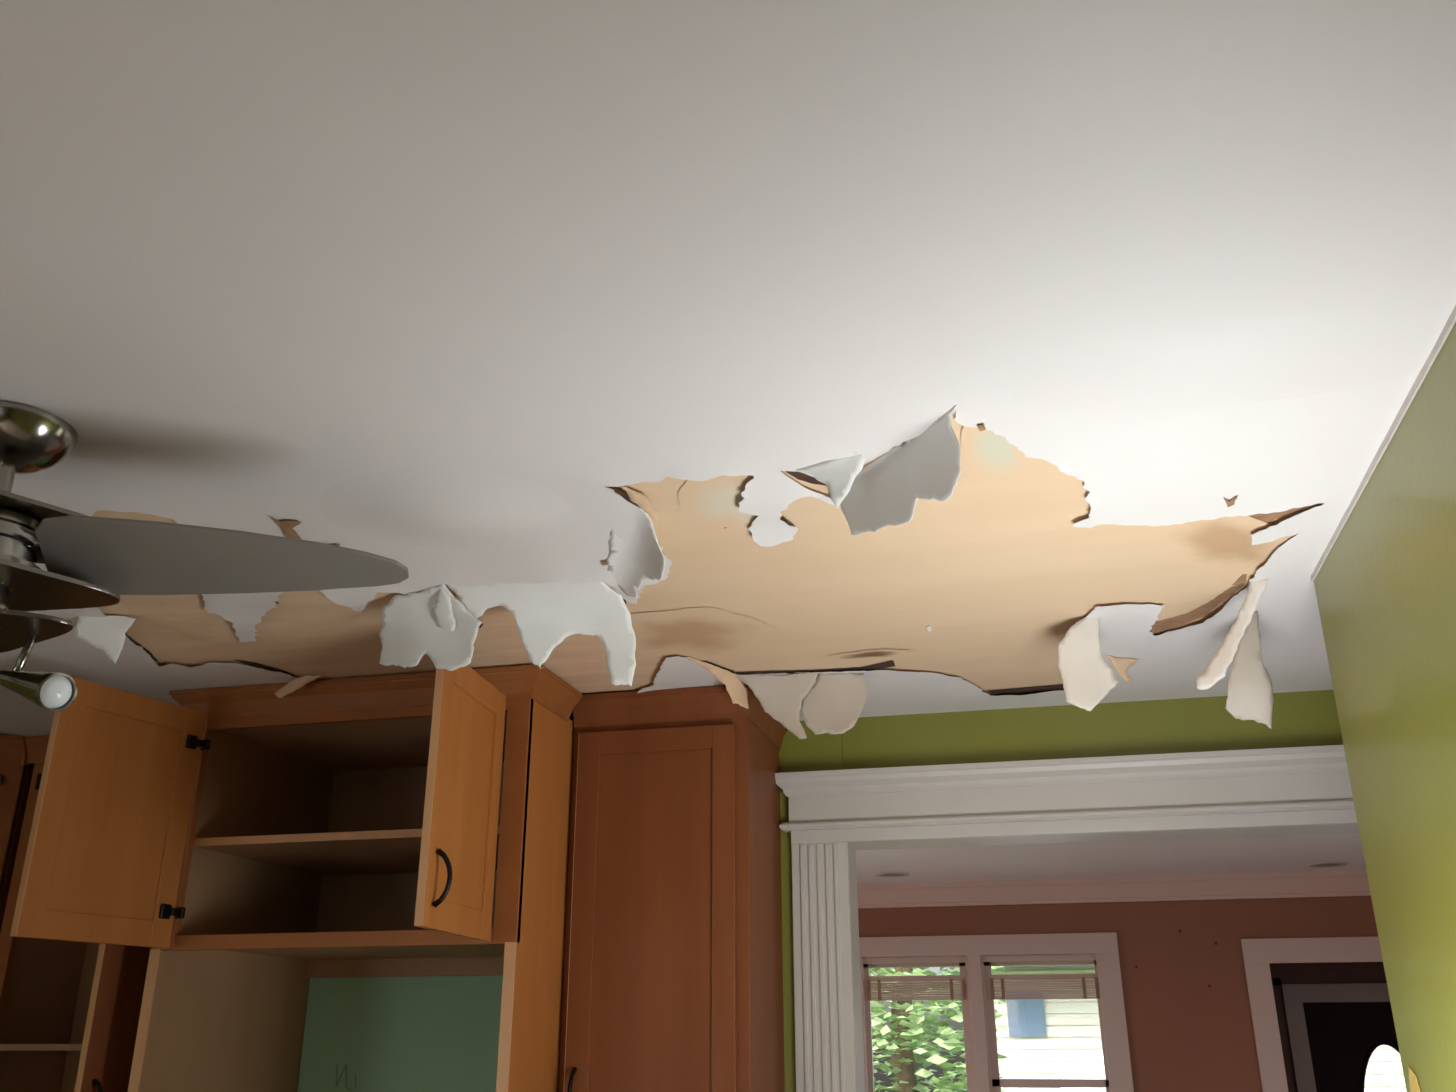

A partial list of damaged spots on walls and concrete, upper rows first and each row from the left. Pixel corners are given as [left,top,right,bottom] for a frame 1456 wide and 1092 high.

peeling [74,404,1274,739]
peeling [1266,503,1324,536]